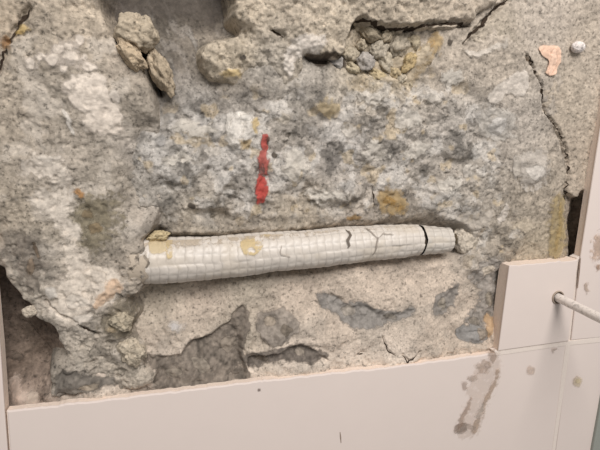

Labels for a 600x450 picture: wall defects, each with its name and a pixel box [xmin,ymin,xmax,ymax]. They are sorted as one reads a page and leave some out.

crack [349,0,507,44]
flaking render [571,41,586,53]
crack [528,55,570,199]
spalling [116,0,525,344]
spalling [73,190,125,253]
spalling [567,197,583,256]
spalling [12,233,49,295]
spalling [0,288,122,401]
spalling [100,296,141,339]
spalling [144,306,329,389]